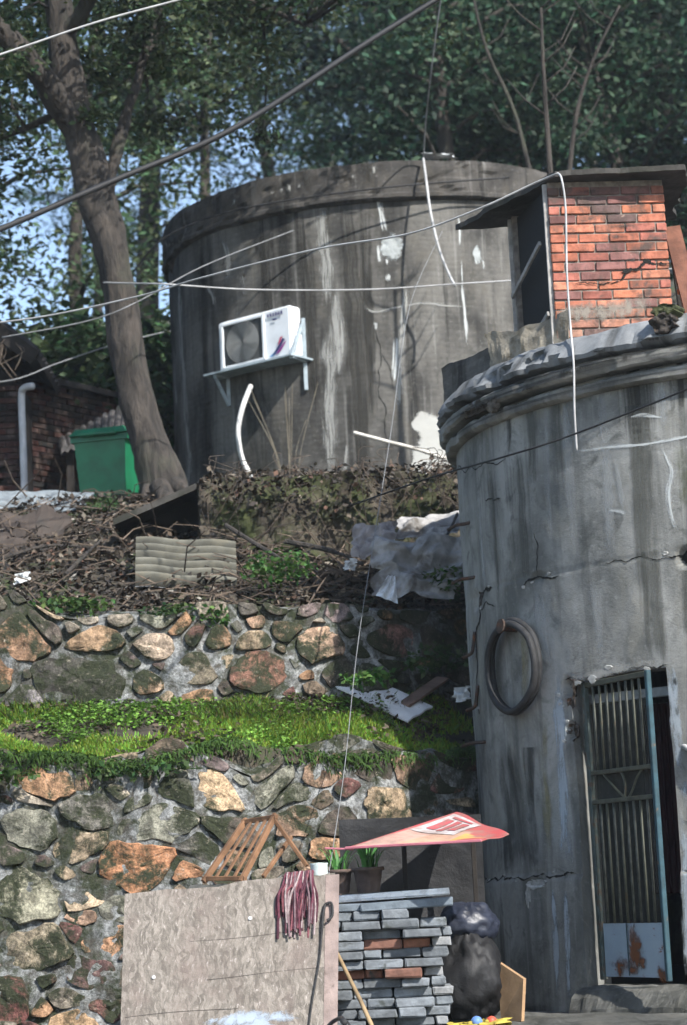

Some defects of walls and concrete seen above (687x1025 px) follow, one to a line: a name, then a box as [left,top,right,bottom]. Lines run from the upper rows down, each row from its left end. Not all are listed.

damp [259,223,275,311]
peeling [377,202,404,280]
crack [576,259,670,285]
damp [300,207,468,470]
damp [449,334,687,647]
crack [521,536,557,589]
crack [606,551,687,564]
crack [484,871,576,883]
rust [615,925,645,977]